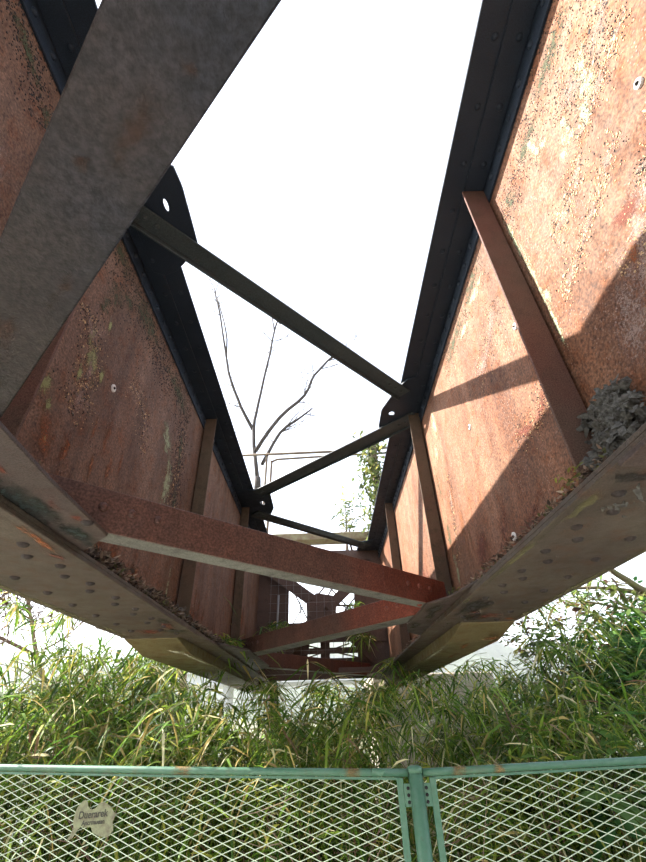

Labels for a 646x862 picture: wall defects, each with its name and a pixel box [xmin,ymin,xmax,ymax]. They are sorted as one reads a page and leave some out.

rust [613,177,646,361]